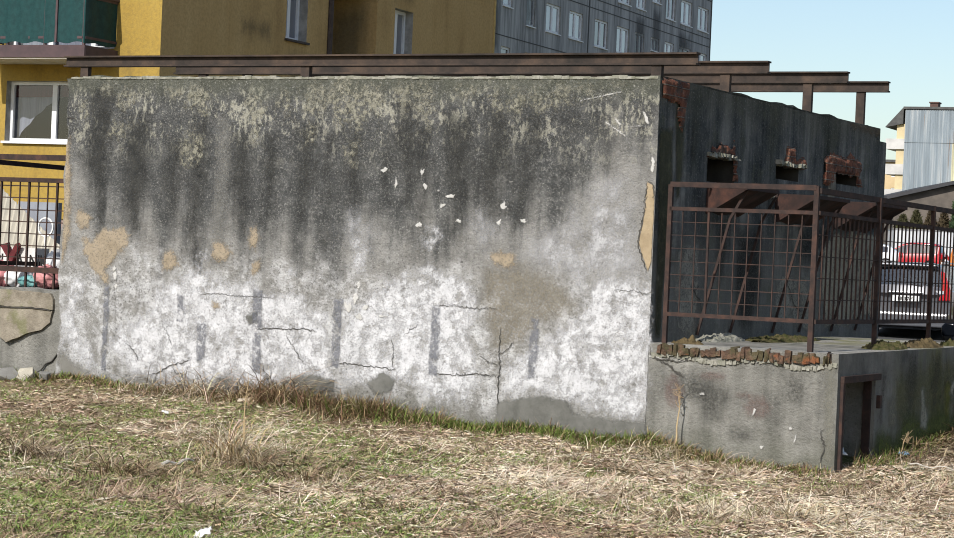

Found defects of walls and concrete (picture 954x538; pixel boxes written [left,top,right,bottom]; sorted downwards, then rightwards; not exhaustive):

flaking render [61,143,129,285]
water stain [89,90,111,209]
water stain [127,119,148,229]
peeling [541,186,632,279]
peeling [639,182,654,270]
flaking render [662,77,690,131]
flaking render [823,152,862,188]
flaking render [0,289,55,342]
crack [129,329,189,382]
crack [435,304,514,405]